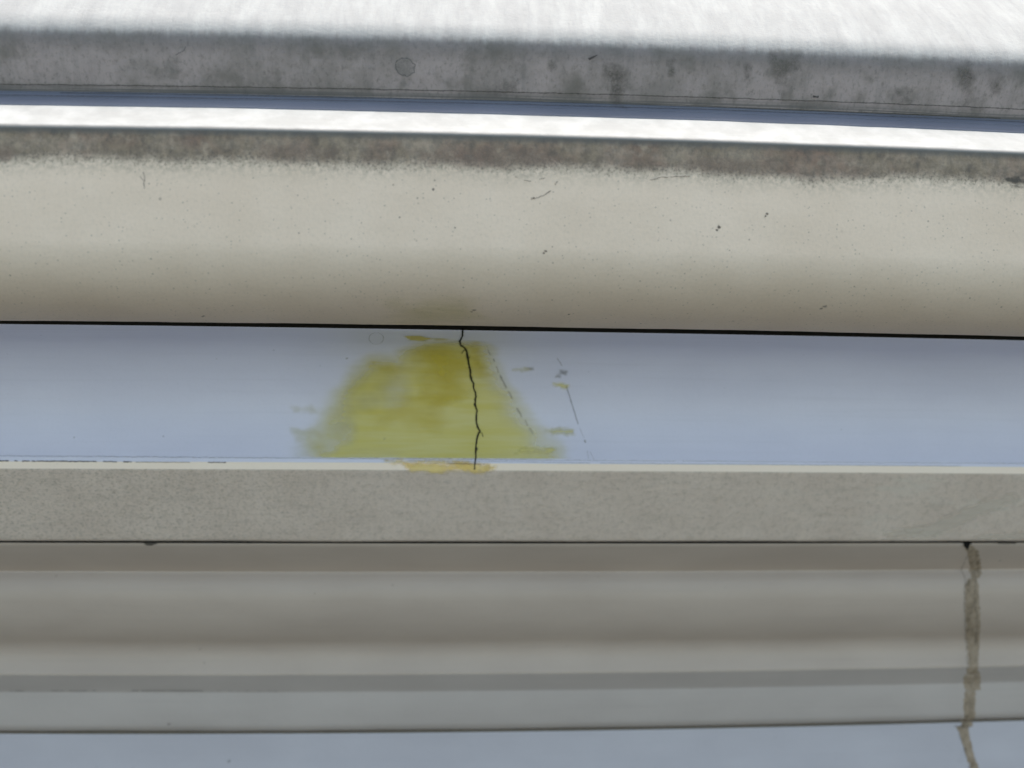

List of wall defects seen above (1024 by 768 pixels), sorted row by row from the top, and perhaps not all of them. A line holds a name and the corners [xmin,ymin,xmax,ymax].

leakage [326,336,552,473]
crack [448,328,483,470]